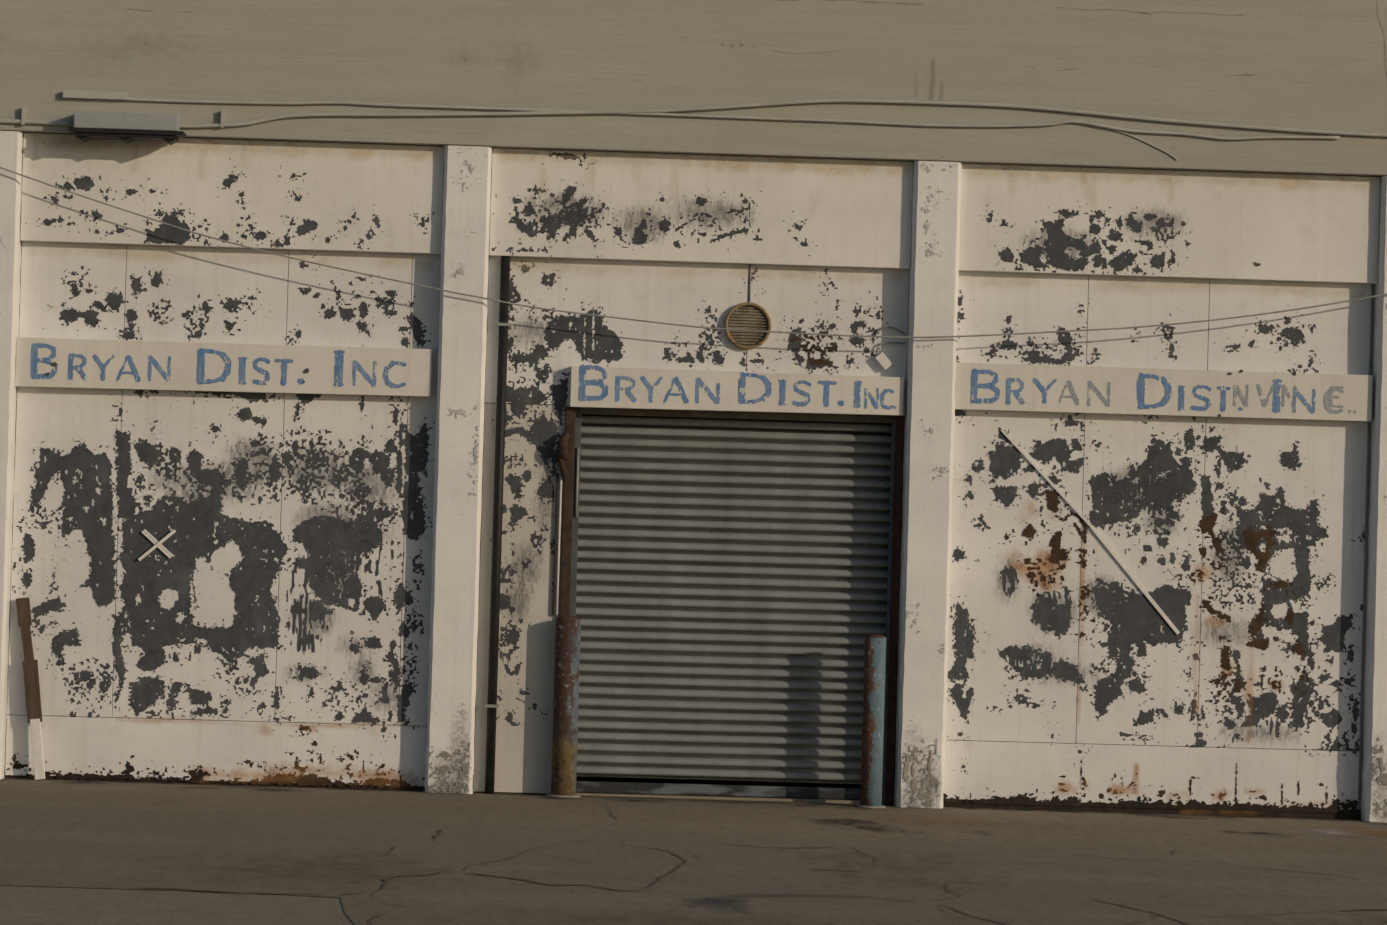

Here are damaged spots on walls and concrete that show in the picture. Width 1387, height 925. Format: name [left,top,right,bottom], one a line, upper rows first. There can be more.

crack [1058,7,1243,16]
peeling [36,158,431,348]
peeling [662,269,895,375]
peeling [783,211,817,256]
peeling [979,201,1191,275]
peeling [451,150,765,729]
peeling [12,368,435,742]
corrosion [1003,489,1097,645]
peeling [902,409,1387,819]
corrosion [1189,504,1315,701]
spalling [429,740,470,794]